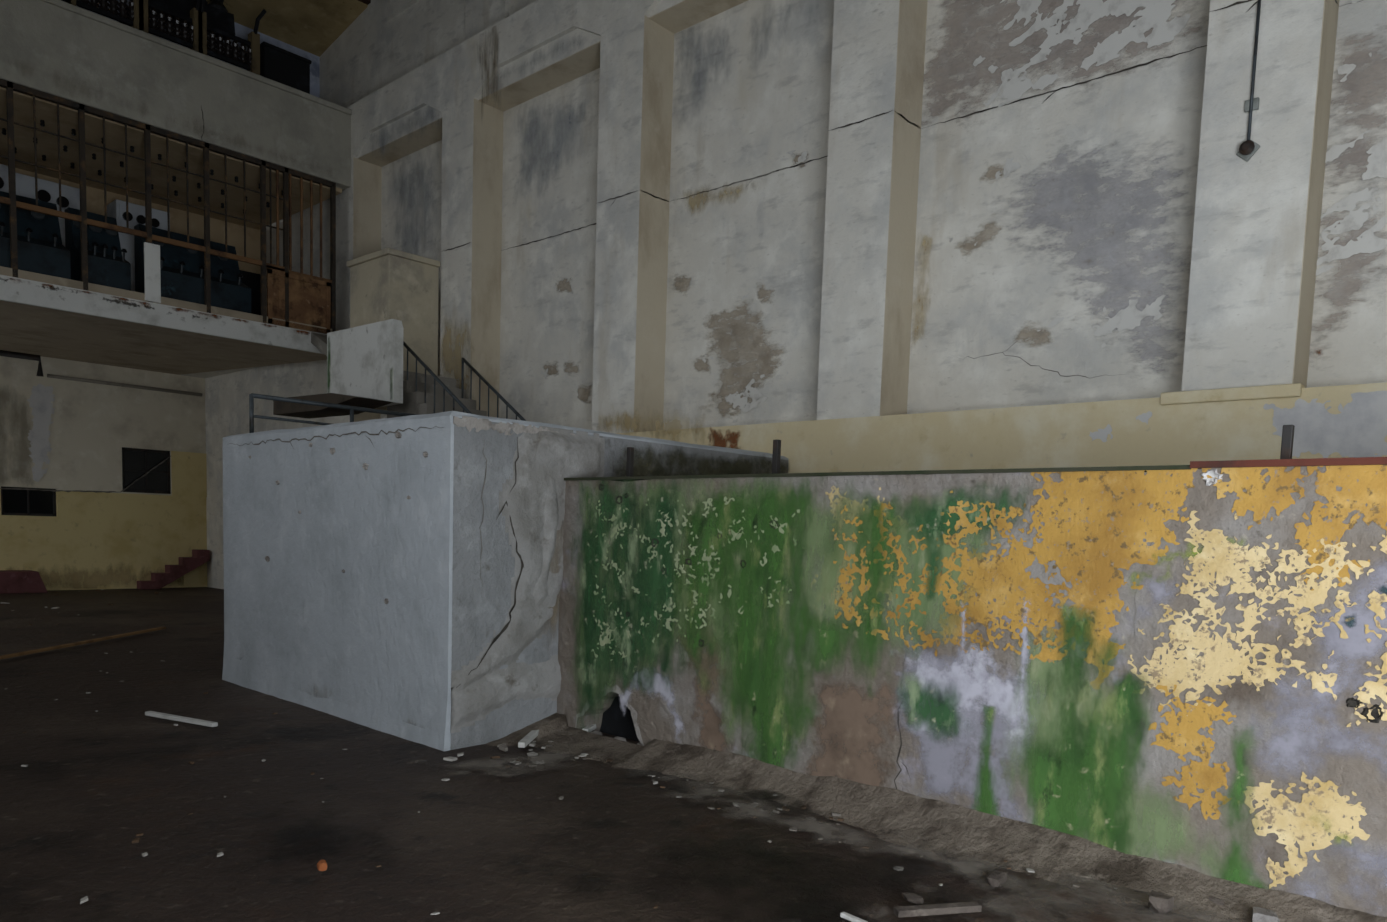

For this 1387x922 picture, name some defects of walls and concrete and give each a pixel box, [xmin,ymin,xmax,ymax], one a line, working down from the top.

peeling [923,0,1200,116]
peeling [1315,36,1387,331]
peeling [695,286,788,423]
water stain [928,511,941,598]
water stain [1063,606,1090,677]
peeling [825,391,1387,889]
water stain [898,602,1035,820]
water stain [1060,675,1143,823]
spalling [1149,890,1174,914]
spalling [1252,907,1279,922]